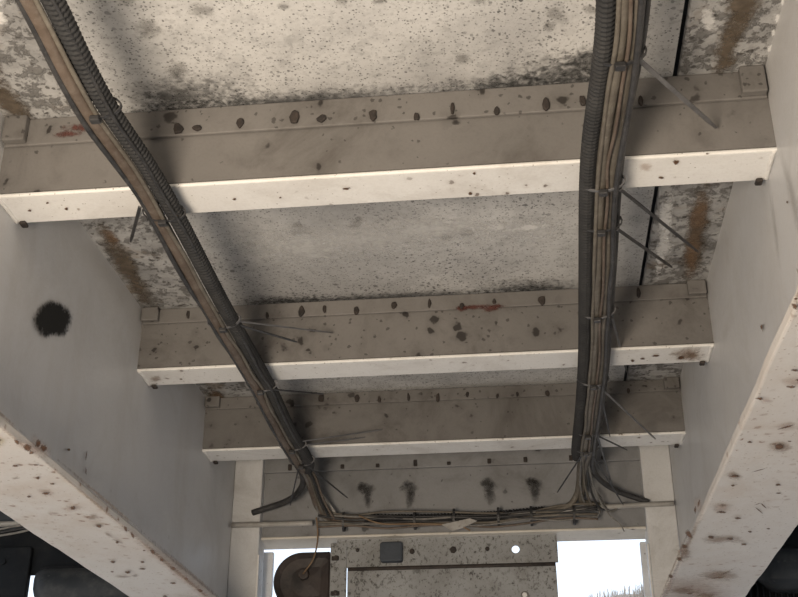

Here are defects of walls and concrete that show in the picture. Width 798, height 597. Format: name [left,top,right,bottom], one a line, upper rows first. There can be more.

rust [714,0,759,70]
mould [478,54,592,89]
rust [0,82,30,117]
leakage [149,81,218,110]
leakage [230,90,364,106]
rust [684,191,709,277]
rust [98,225,150,302]
rust [457,304,501,312]